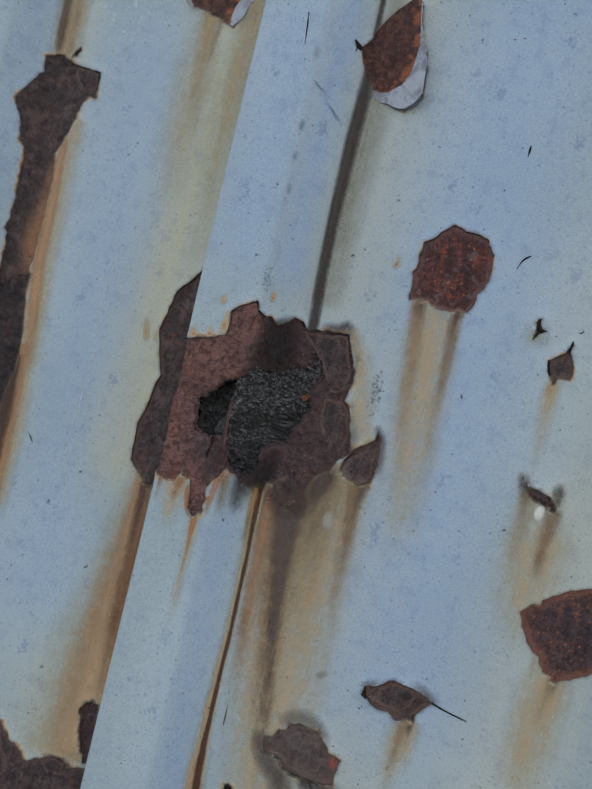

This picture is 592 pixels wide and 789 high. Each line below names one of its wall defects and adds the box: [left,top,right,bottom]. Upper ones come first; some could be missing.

corrosion [0,53,101,502]
corrosion [0,273,381,789]
corrosion [394,226,494,501]
corrosion [503,476,592,781]
corrosion [541,341,574,418]